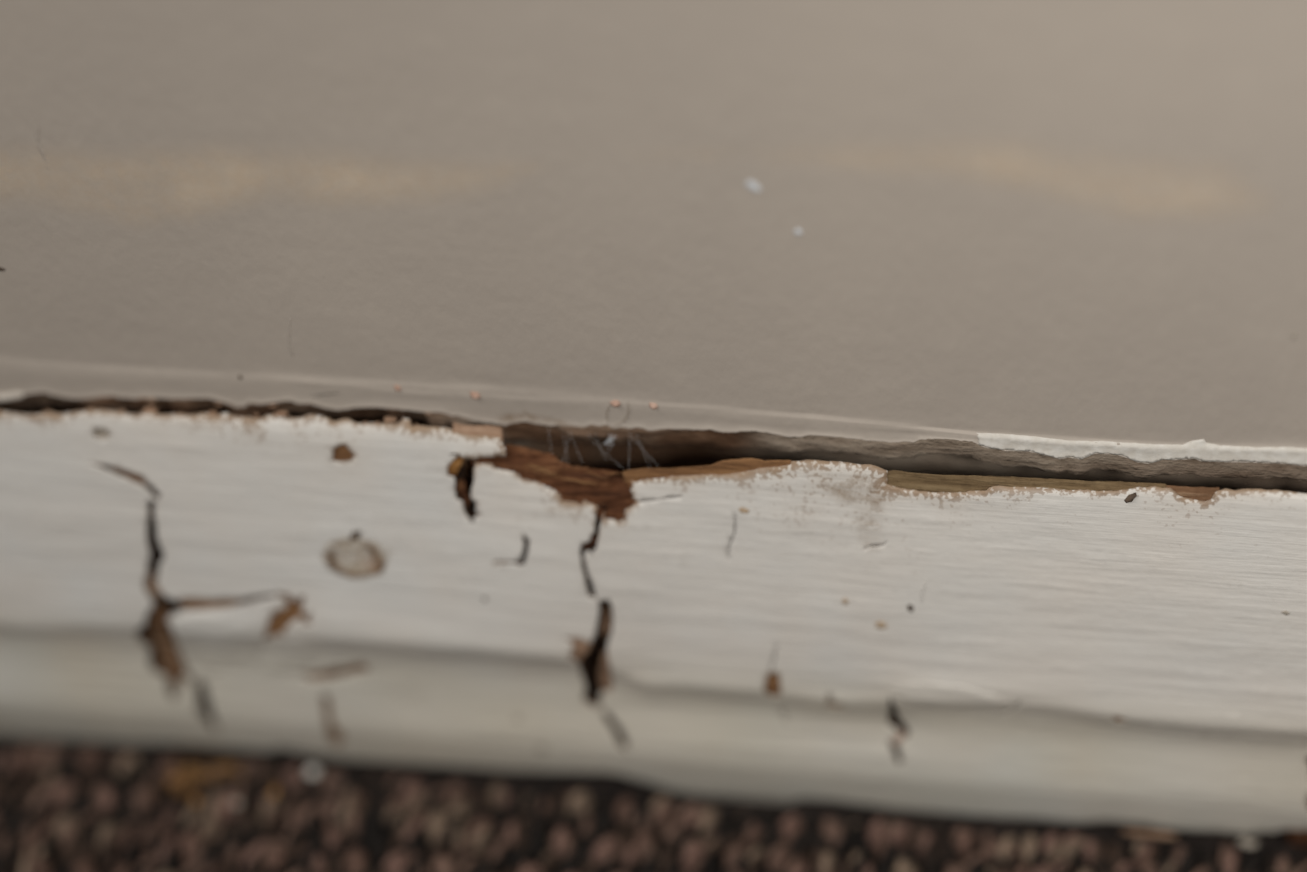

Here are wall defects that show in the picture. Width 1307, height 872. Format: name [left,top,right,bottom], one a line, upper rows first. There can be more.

peeling [453,422,503,443]
crack [0,393,1307,523]
peeling [622,458,791,488]
crack [494,537,529,564]
crack [97,464,278,730]
crack [570,504,628,748]
crack [888,696,909,763]